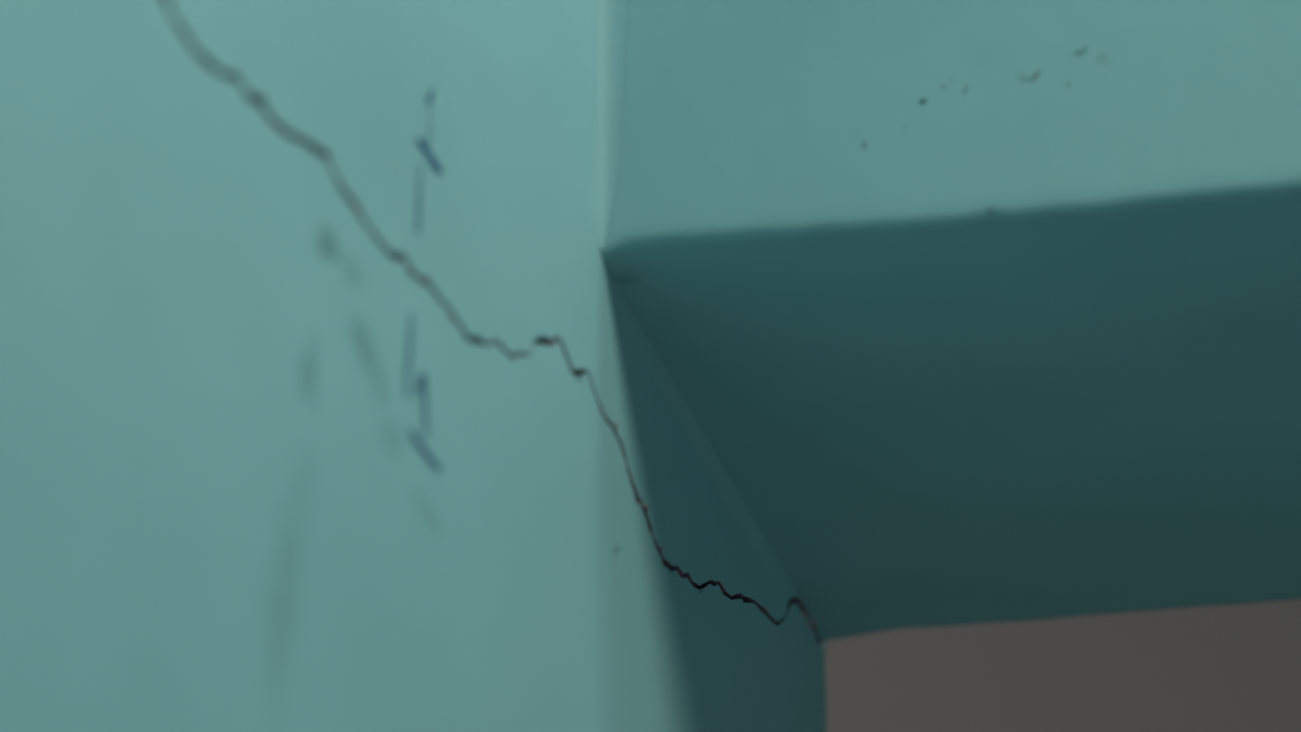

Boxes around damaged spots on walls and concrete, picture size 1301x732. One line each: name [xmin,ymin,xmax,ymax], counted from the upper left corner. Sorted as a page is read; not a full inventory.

crack [164,0,821,644]